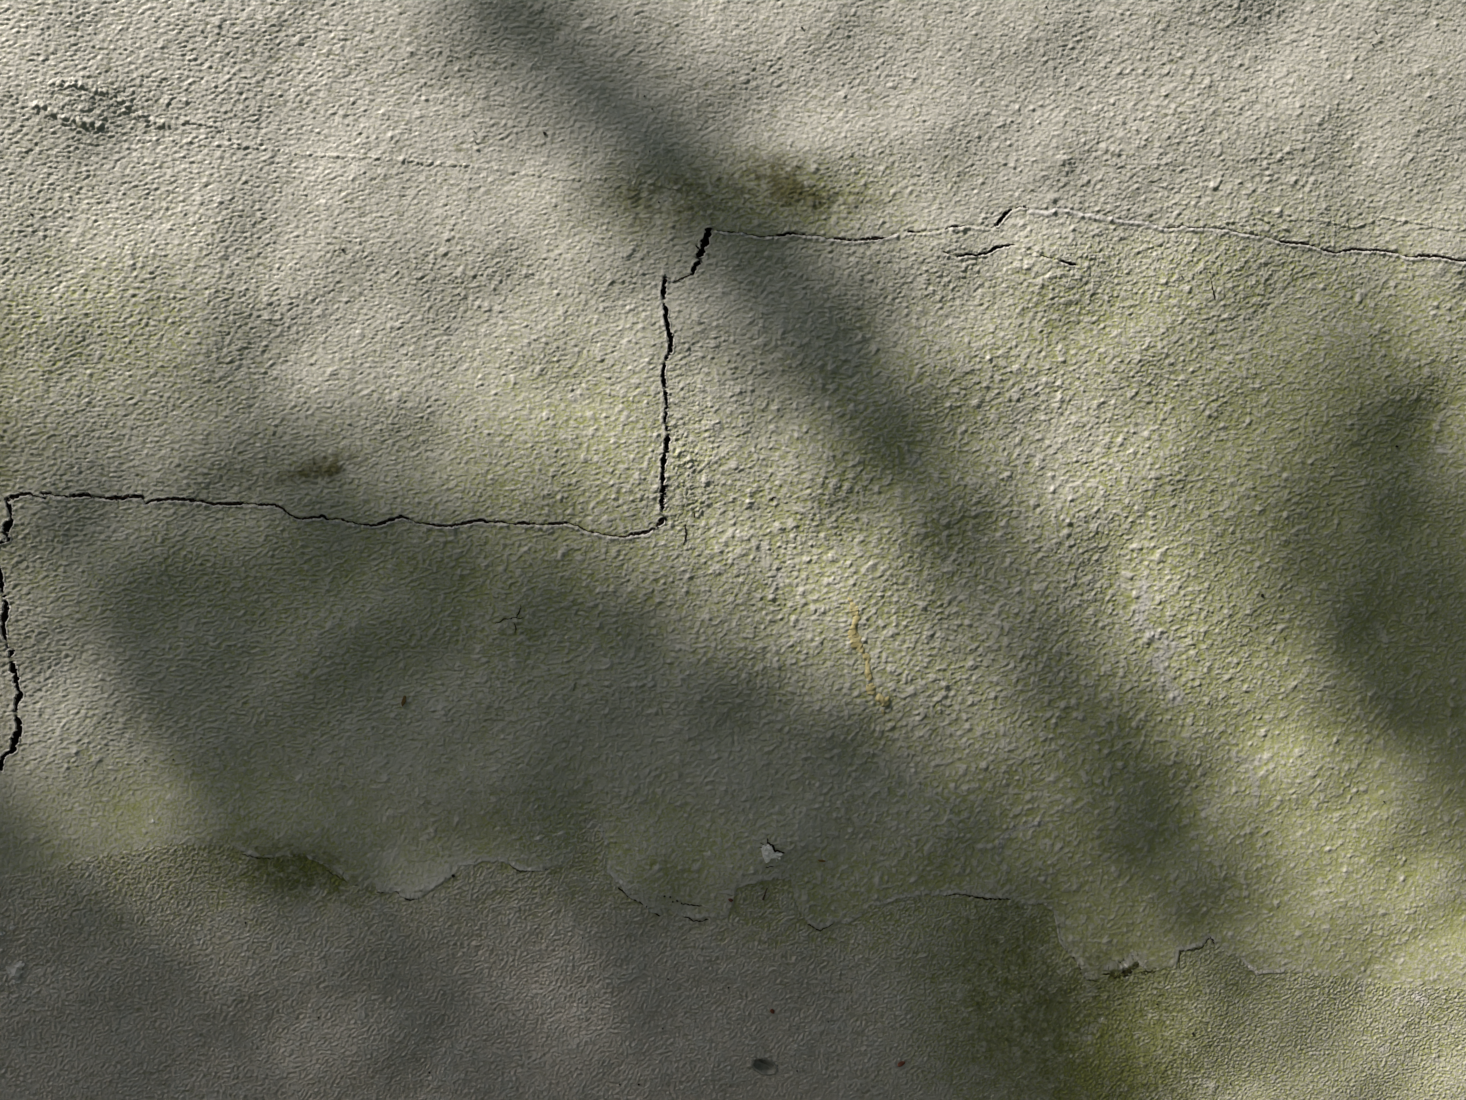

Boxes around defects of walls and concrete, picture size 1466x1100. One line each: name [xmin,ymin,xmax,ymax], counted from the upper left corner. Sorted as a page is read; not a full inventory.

crack [0,204,1466,773]
spalling [737,838,792,888]